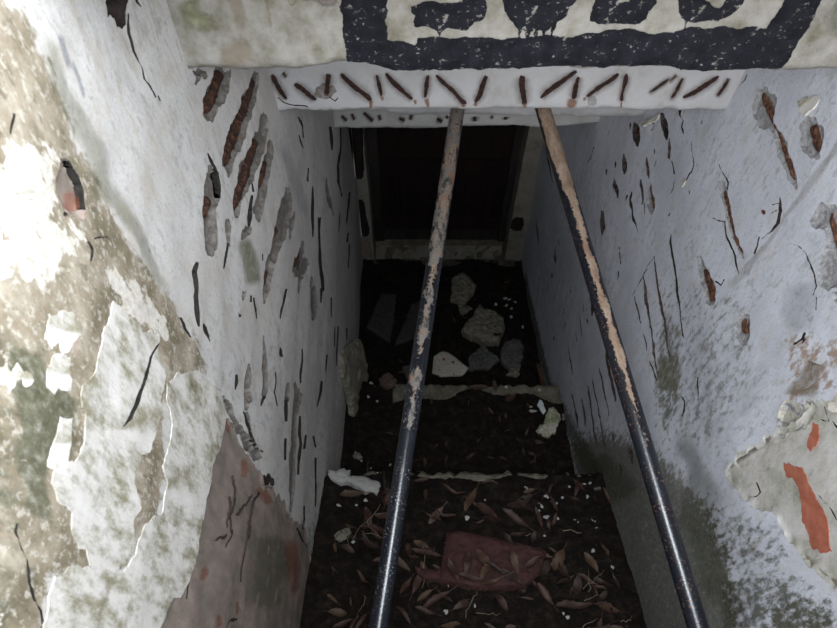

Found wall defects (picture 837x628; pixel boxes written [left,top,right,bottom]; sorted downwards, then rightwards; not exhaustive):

crack [127,0,161,101]
spalling [193,67,231,123]
corrosion [271,72,287,100]
corrosion [294,73,488,122]
corrosion [519,75,527,107]
corrosion [540,70,628,108]
spalling [752,86,798,189]
spalling [56,158,86,221]
spalling [202,71,274,269]
peeling [0,363,34,394]
crack [123,343,160,427]
peeling [42,301,311,628]